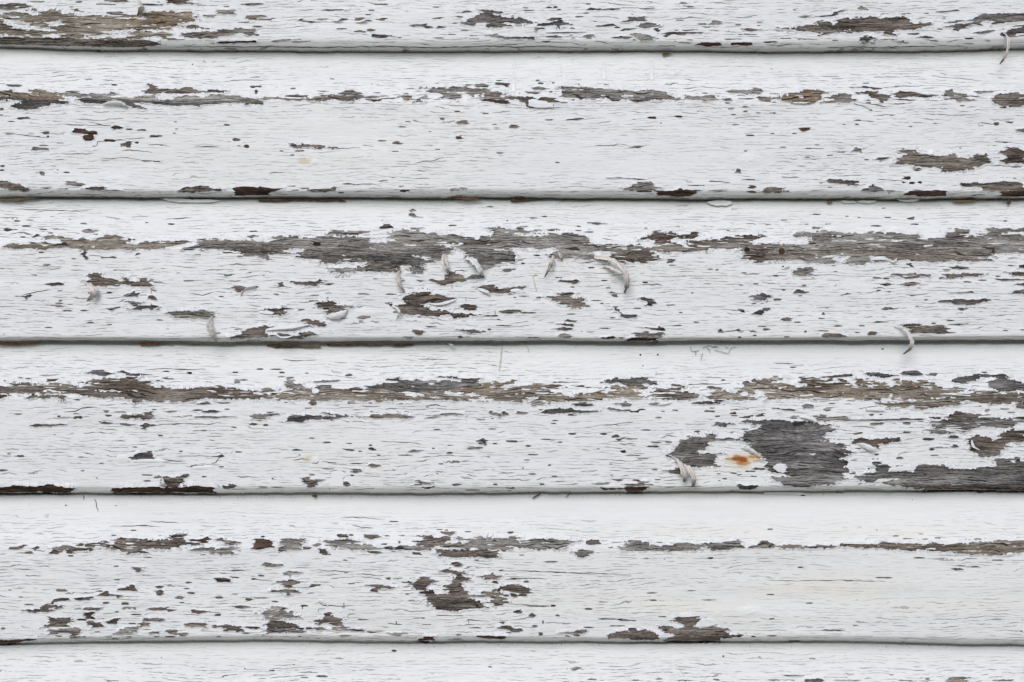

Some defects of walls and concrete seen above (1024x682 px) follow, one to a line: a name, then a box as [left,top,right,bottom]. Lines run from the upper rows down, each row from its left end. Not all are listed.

peeling [0,0,275,49]
peeling [301,3,445,40]
peeling [457,4,1024,48]
peeling [0,80,1024,126]
peeling [849,126,1024,197]
peeling [0,209,1024,344]
peeling [0,366,1024,496]
corrosion [725,455,761,465]
peeling [616,535,1024,571]
peeling [0,529,603,645]
peeling [600,612,741,645]